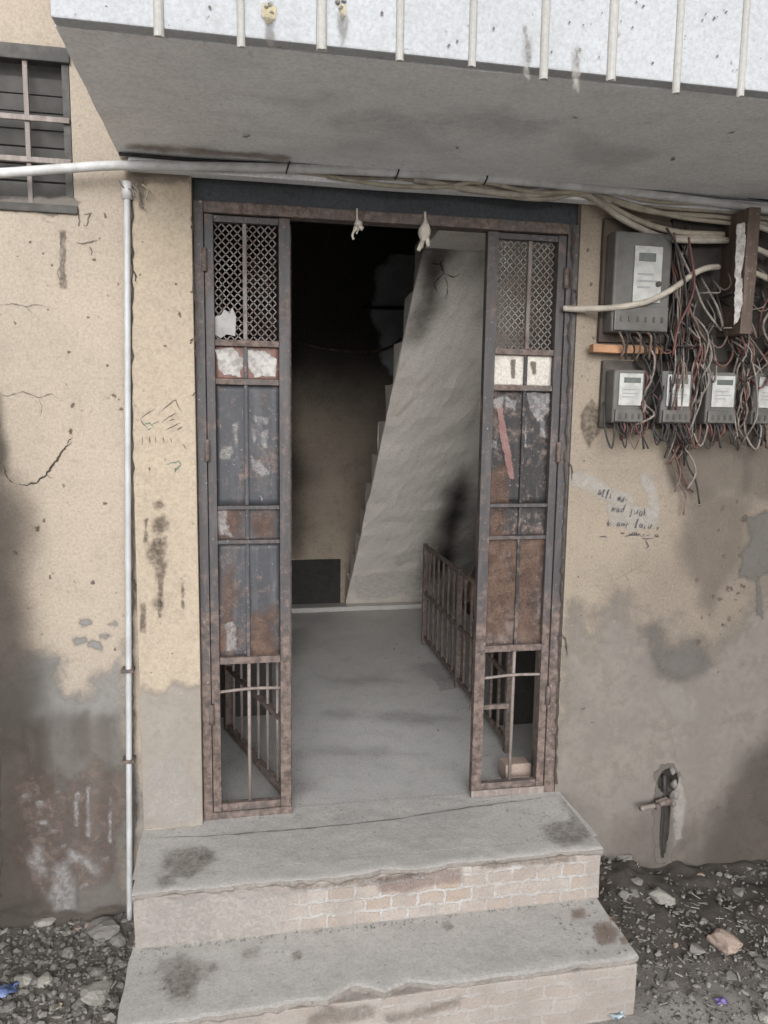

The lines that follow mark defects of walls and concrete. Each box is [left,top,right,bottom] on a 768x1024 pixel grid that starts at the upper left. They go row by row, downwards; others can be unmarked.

crack [0,391,62,416]
crack [4,438,73,486]
crack [177,216,578,837]
water stain [0,487,126,930]
peeling [26,619,203,915]
peeling [555,584,768,868]